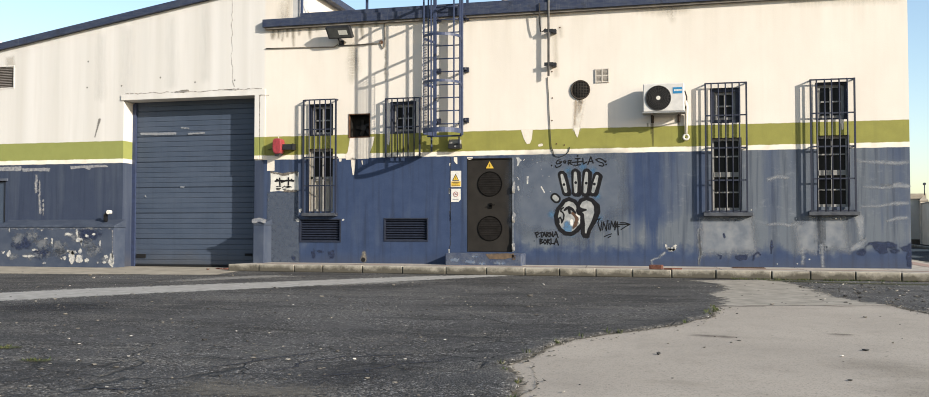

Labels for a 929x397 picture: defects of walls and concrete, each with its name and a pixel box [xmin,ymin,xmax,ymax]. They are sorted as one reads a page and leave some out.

damp [573,102,583,129]
peeling [339,137,374,175]
peeling [521,129,543,147]
peeling [61,229,114,267]